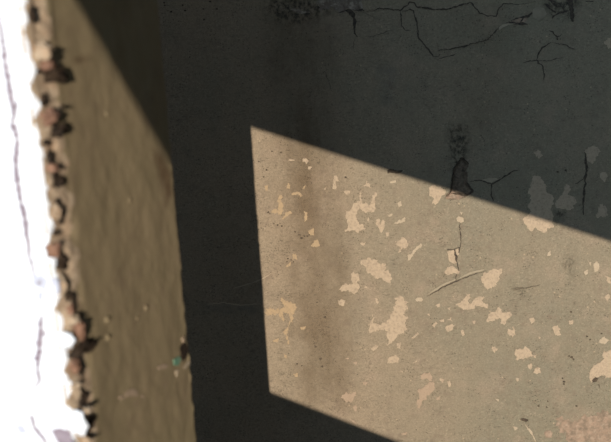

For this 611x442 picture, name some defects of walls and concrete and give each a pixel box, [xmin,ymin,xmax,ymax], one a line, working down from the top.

spalling [28,5,36,24]
spalling [33,40,68,84]
crack [338,0,593,82]
spalling [39,93,69,189]
flaking render [429,157,474,205]
crack [470,170,518,201]
peeling [523,176,577,233]
crack [575,152,588,215]
crack [427,225,486,296]
spalling [31,198,99,442]
peeling [368,296,423,363]
peeling [432,269,516,337]